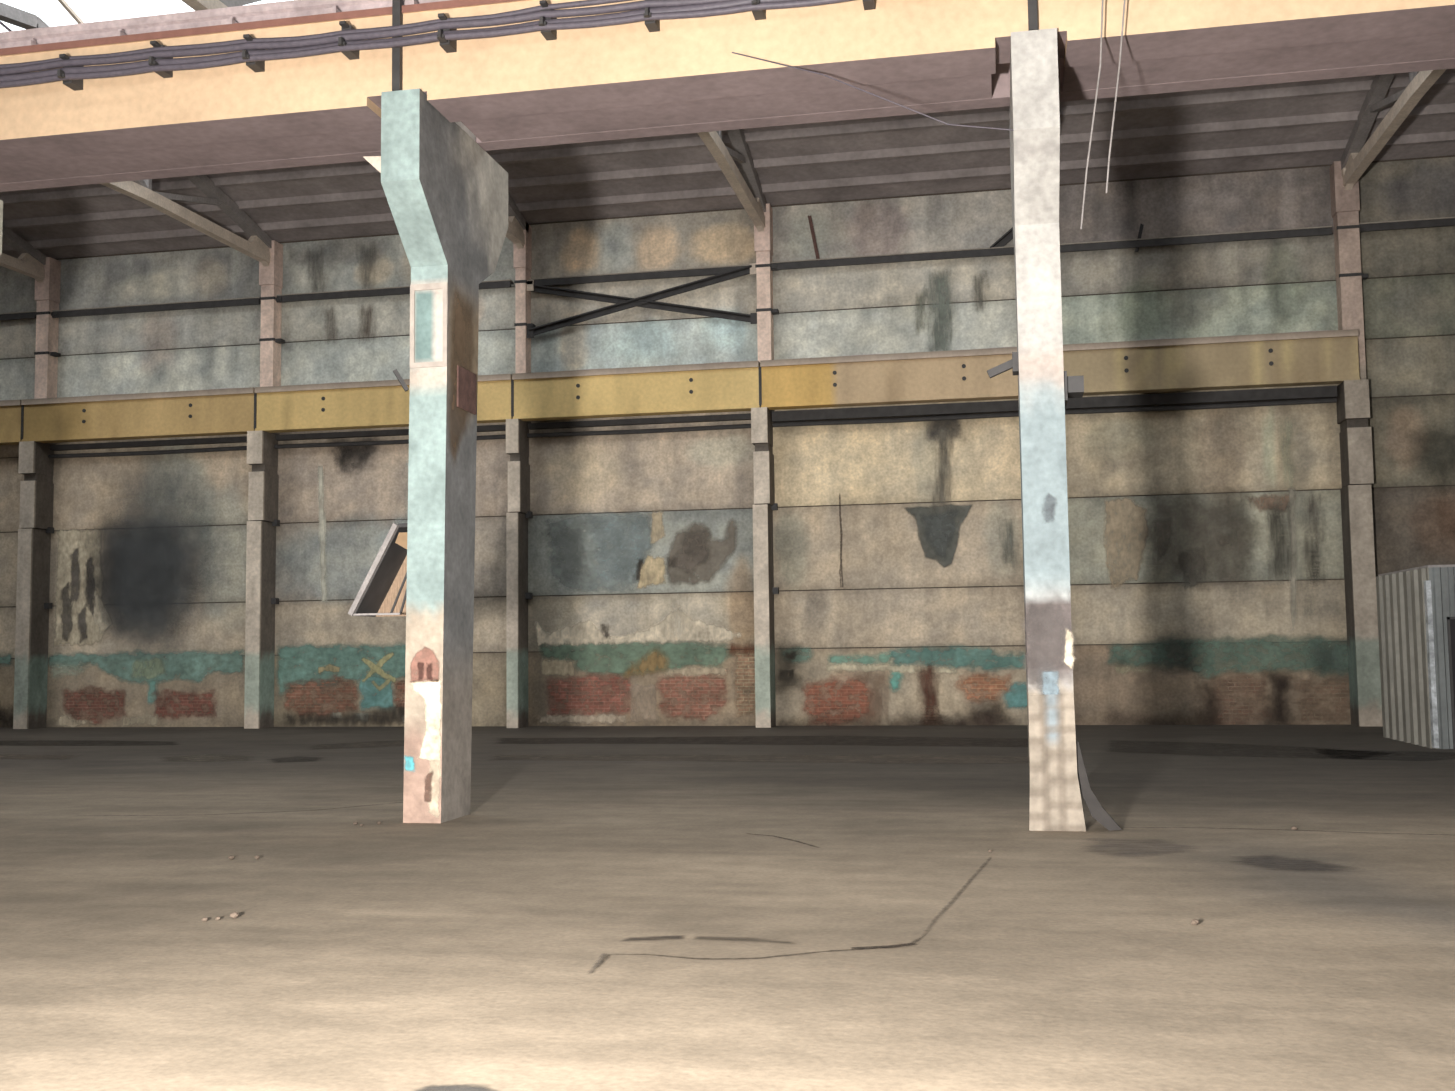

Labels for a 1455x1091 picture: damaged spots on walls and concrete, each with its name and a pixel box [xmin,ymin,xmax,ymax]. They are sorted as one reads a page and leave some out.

peeling [548,512,665,591]
damp [905,420,972,567]
peeling [277,644,441,817]
crack [589,859,989,973]